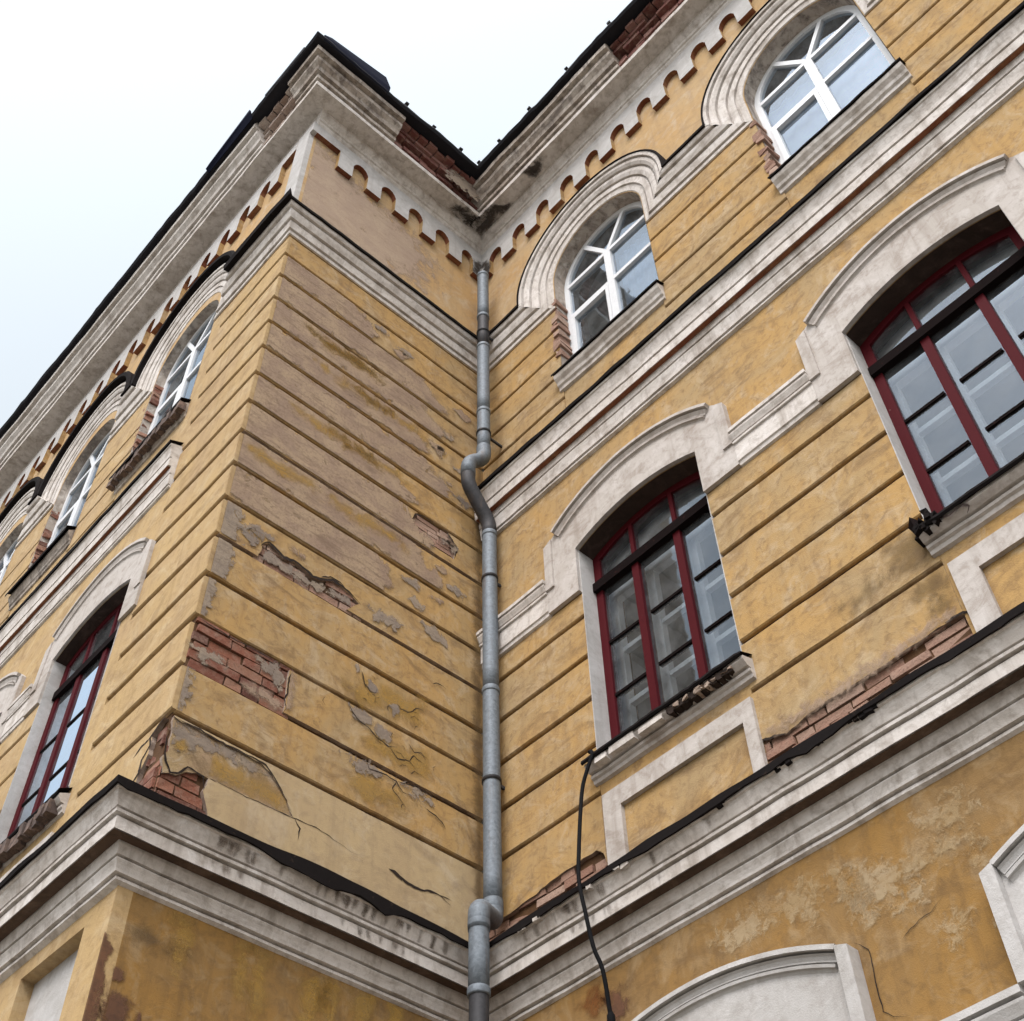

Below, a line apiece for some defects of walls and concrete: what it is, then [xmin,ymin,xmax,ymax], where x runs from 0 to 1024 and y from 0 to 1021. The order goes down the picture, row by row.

spalling [133,256,472,827]
spalling [762,611,973,773]
crack [212,779,362,858]
crack [390,869,450,901]
spalling [489,858,631,942]
crack [855,943,909,1017]